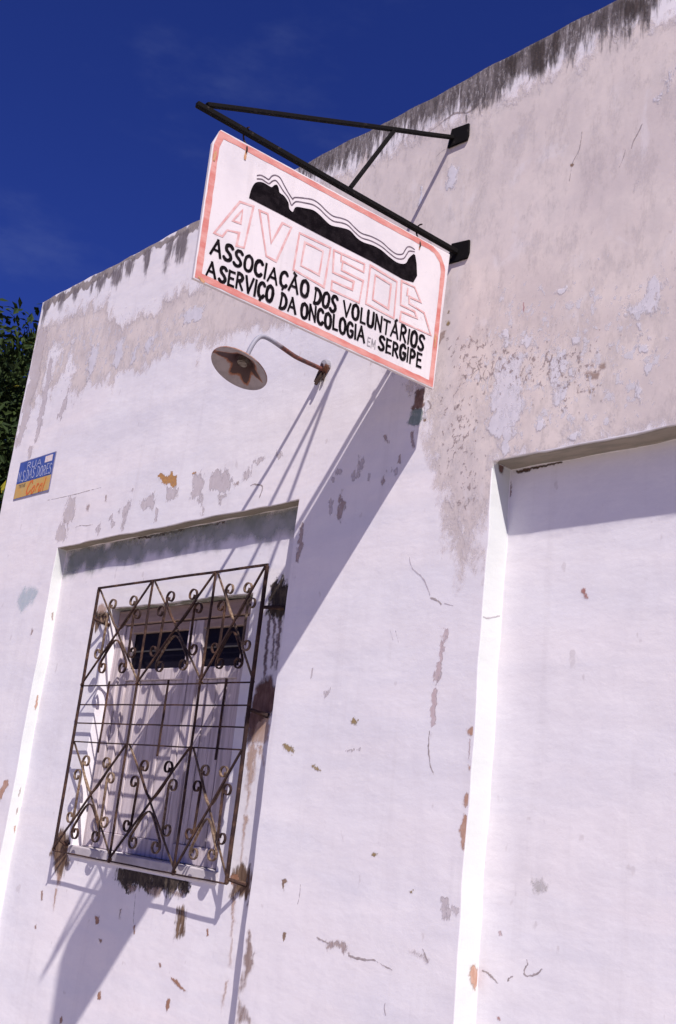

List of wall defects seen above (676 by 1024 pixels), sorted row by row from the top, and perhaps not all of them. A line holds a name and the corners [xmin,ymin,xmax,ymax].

damp [297,0,658,178]
peeling [321,16,676,579]
peeling [30,285,293,407]
damp [496,426,676,474]
crack [409,557,450,605]
rust [247,575,288,796]
peeling [428,629,449,772]
flaking render [459,793,469,849]
damp [116,868,191,899]
rust [230,863,253,919]
crack [317,937,390,969]
crack [482,963,541,983]